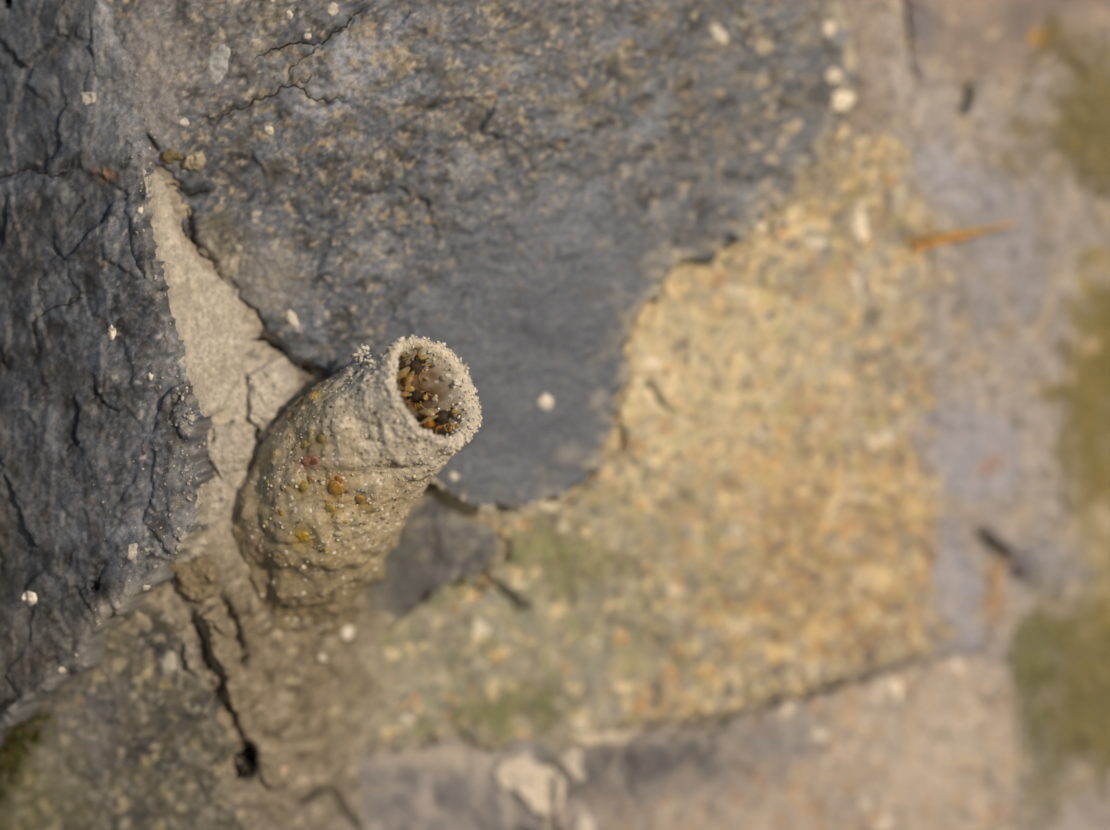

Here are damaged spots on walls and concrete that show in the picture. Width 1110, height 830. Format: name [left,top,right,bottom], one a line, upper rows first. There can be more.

crack [213,3,373,130]
crack [0,151,67,179]
crack [32,269,94,367]
crack [190,594,246,750]